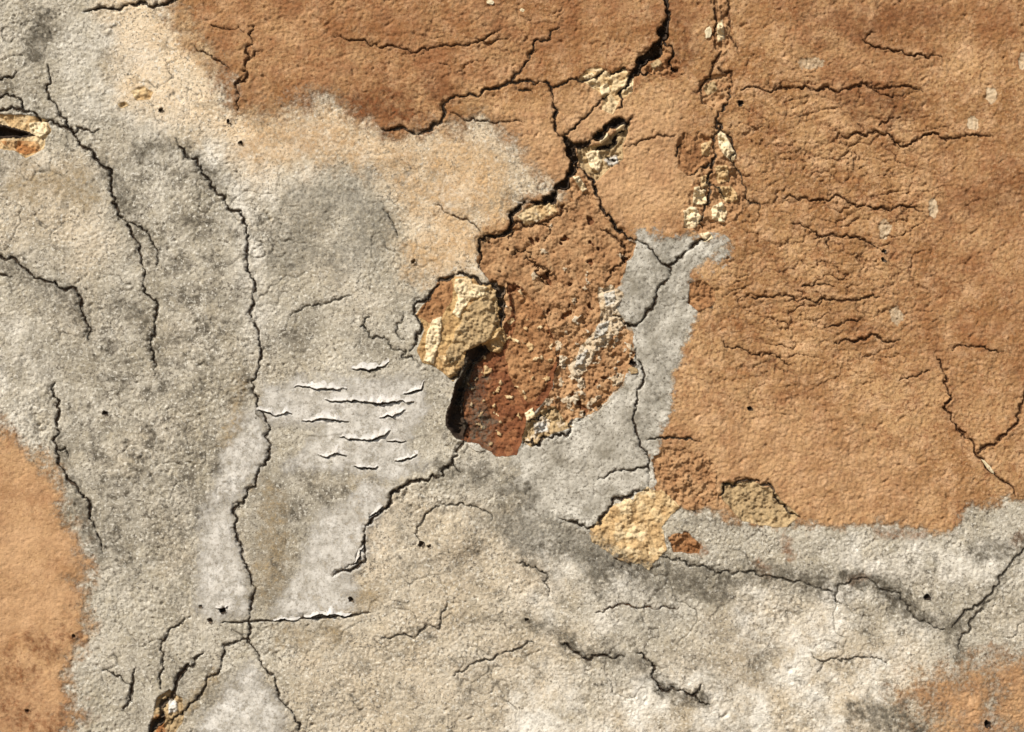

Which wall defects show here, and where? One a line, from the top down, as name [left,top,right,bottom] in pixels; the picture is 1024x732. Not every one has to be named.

spalling [0,114,51,158]
crack [0,67,159,370]
spalling [416,124,636,457]
crack [345,0,985,529]
spalling [676,131,748,242]
crack [107,142,370,732]
peeling [256,379,425,469]
peeling [352,359,389,372]
crack [906,345,1024,497]
crack [333,441,467,576]
spalling [590,447,799,570]
crack [666,549,1024,645]